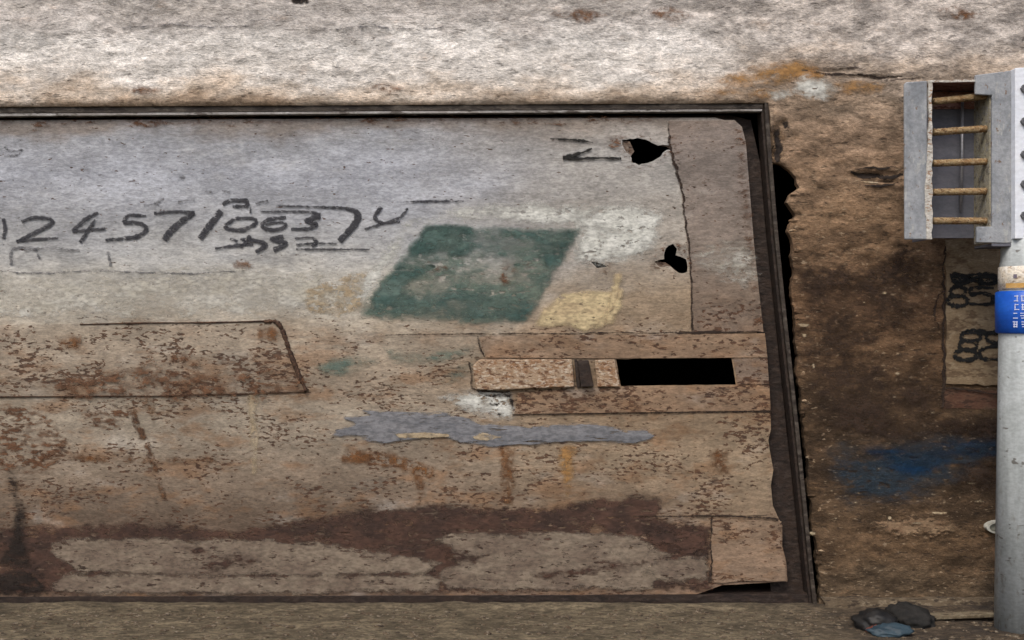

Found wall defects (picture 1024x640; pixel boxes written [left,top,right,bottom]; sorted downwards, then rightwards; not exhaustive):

spalling [0,113,831,596]
rust [0,405,66,472]
rust [43,353,306,472]
rust [342,451,432,495]
rust [501,449,513,503]
peeling [876,512,954,537]